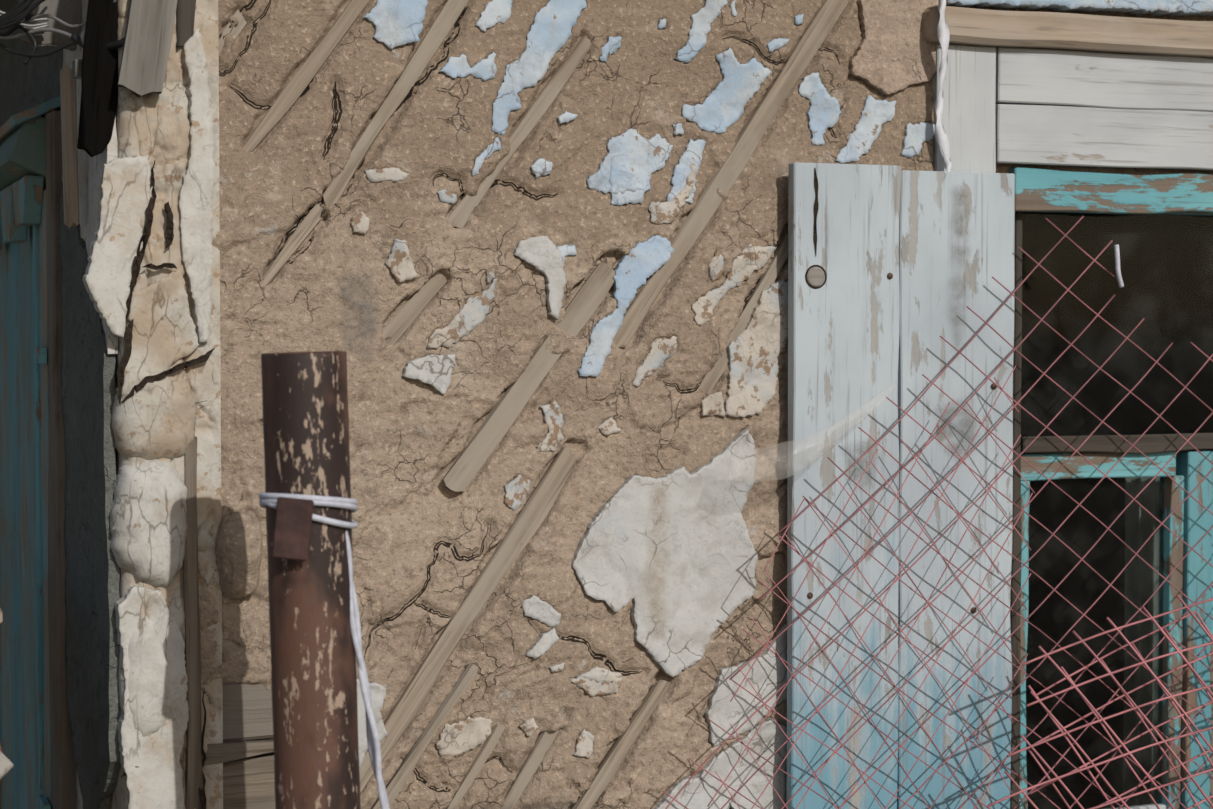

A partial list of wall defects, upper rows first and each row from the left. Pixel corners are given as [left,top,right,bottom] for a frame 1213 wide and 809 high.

crack [219,0,342,160]
crack [390,6,468,118]
peeling [439,0,587,178]
peeling [835,0,1213,164]
peeling [63,0,216,397]
crack [117,160,215,405]
crack [274,158,365,264]
crack [433,173,558,201]
peeling [577,14,803,377]
crack [812,169,820,252]
peeling [571,280,788,677]
peeling [653,624,787,809]